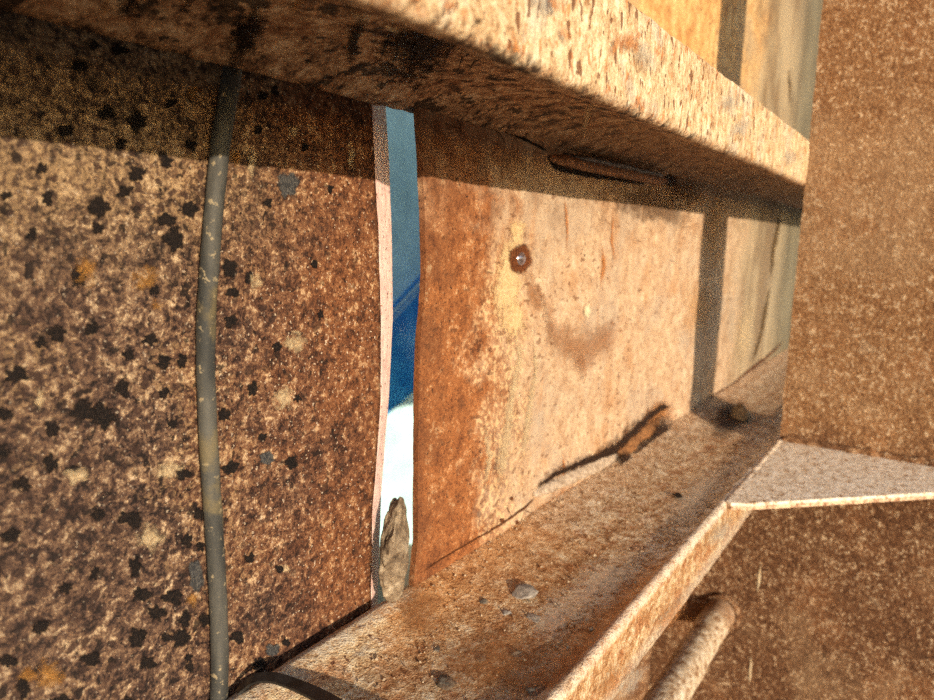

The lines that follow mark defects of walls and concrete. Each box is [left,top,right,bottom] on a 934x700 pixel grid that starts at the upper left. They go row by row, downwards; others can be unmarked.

damp [378,29,481,91]
corrosion [509,244,533,273]
crack [425,500,533,571]